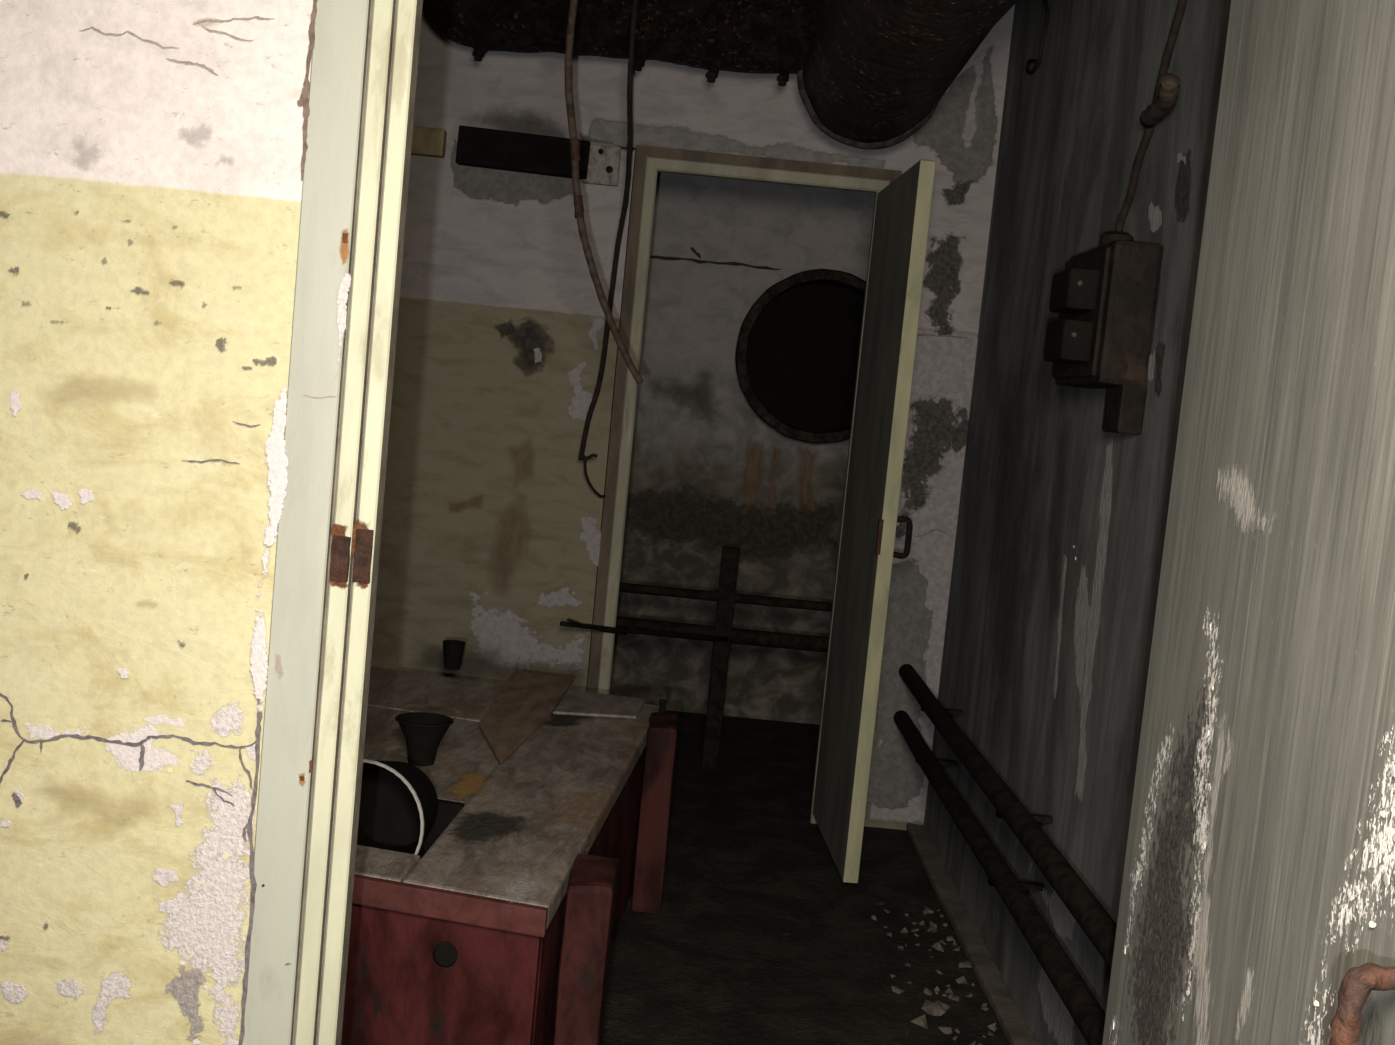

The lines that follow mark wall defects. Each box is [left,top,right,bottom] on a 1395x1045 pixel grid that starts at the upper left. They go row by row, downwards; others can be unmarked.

crack [81,16,275,75]
corrosion [331,520,369,555]
corrosion [329,581,368,589]
peeling [104,386,289,1045]
crack [0,693,261,808]
peeling [56,970,132,1034]